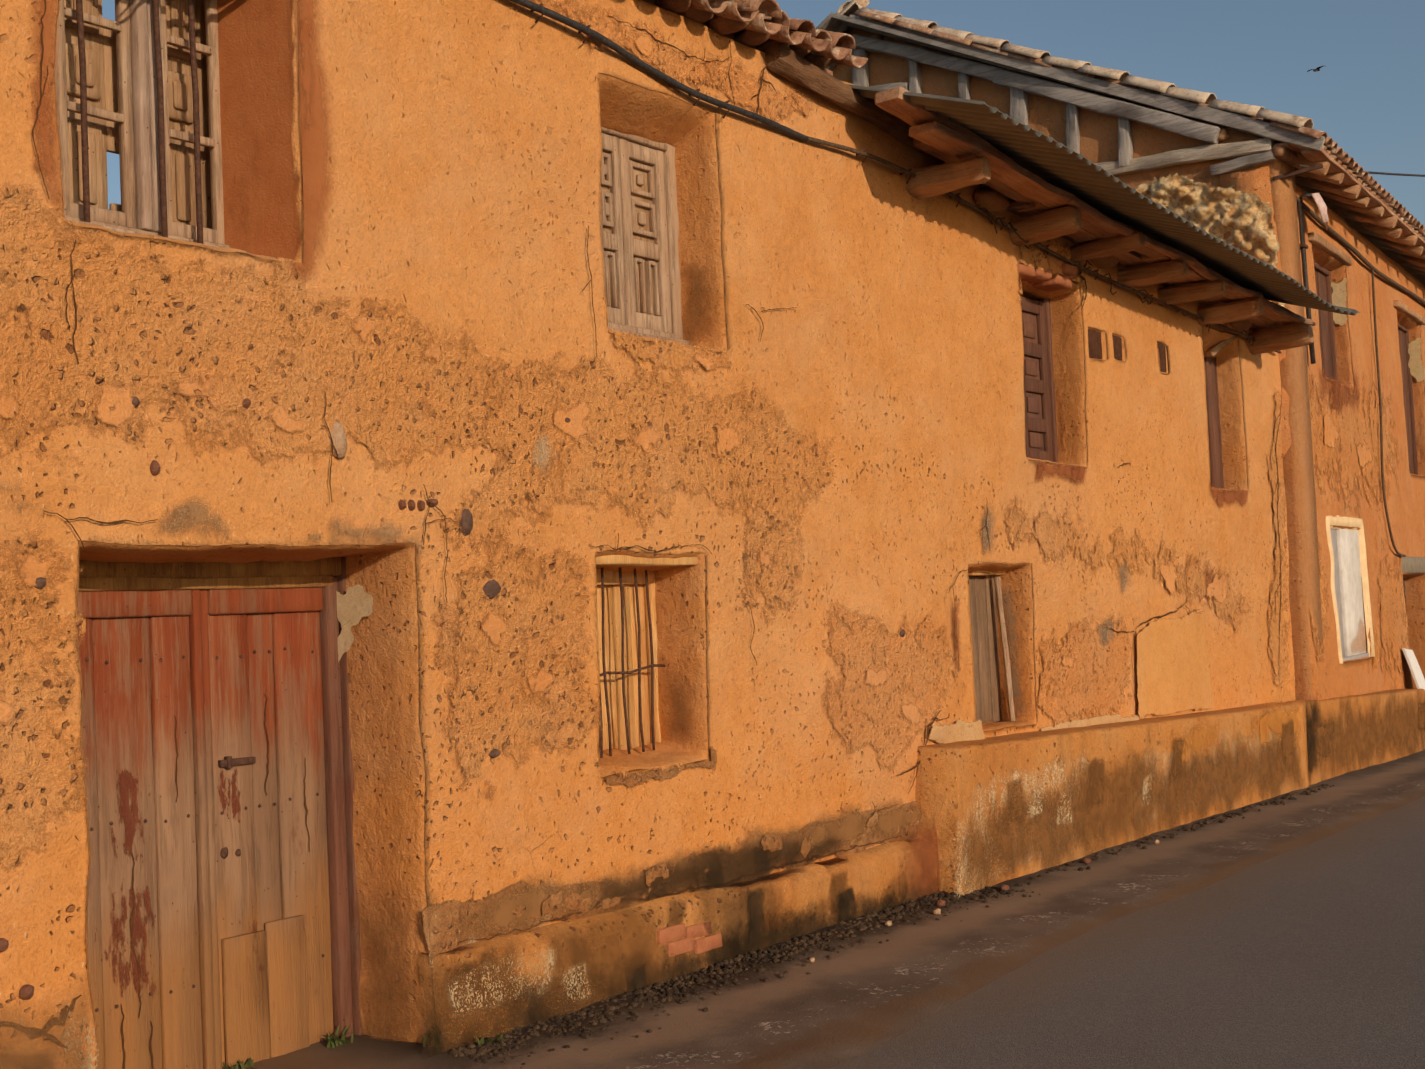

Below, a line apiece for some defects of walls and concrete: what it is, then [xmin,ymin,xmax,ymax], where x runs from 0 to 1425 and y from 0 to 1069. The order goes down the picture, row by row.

crack [32,0,50,199]
crack [43,510,158,548]
spalling [0,185,833,798]
spalling [823,604,959,771]
spalling [1005,495,1250,633]
crack [1108,601,1199,700]
crack [1274,368,1282,683]
leakage [956,697,1425,897]
crack [0,995,82,1049]
leakage [428,804,940,1056]